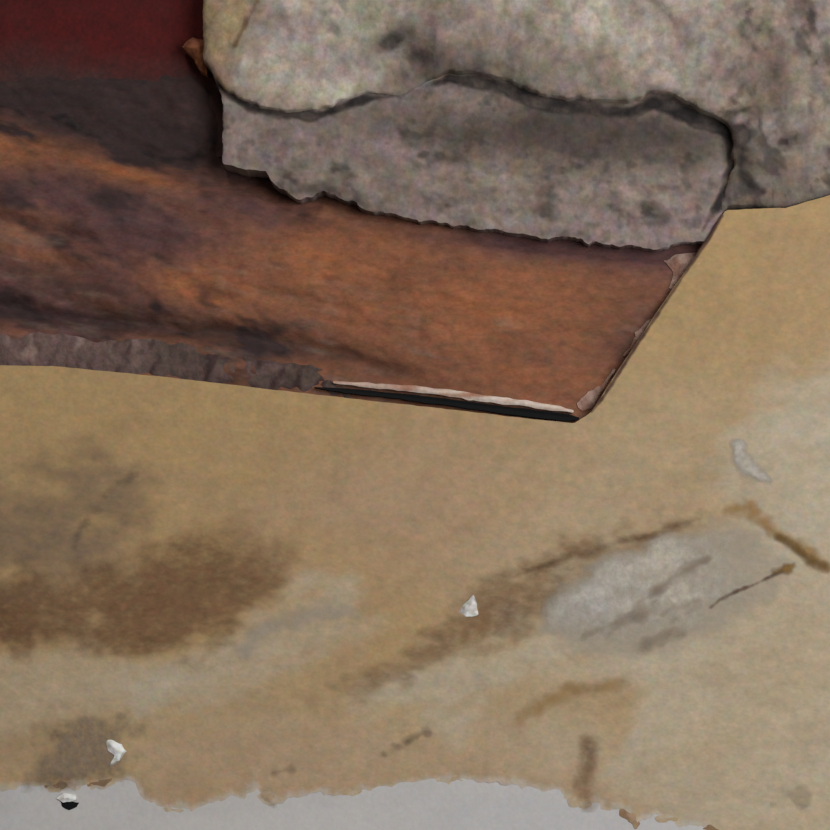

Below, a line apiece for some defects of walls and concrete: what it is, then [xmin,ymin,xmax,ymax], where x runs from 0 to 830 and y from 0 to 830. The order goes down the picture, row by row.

crack [220,86,379,121]
flaking render [0,75,703,420]
crack [314,75,765,422]
water stain [0,544,266,653]
peeling [0,195,830,830]
corrosion [734,502,827,568]